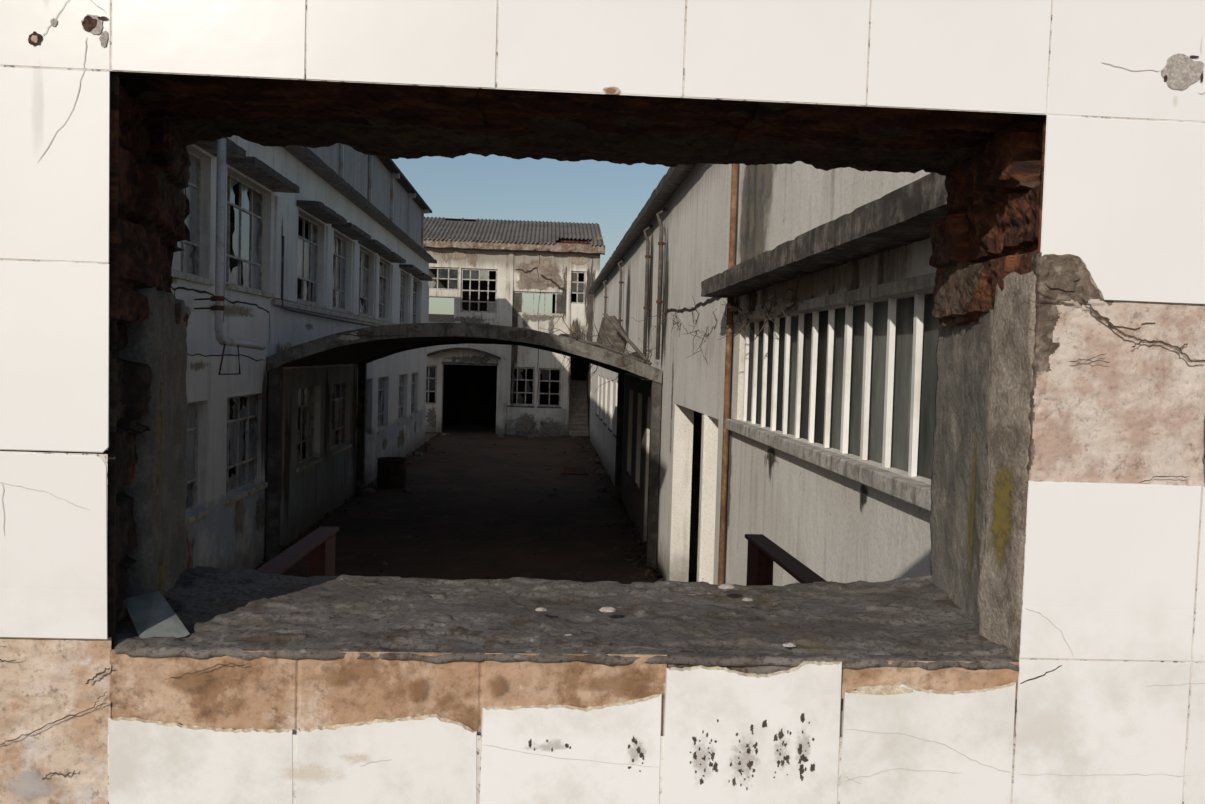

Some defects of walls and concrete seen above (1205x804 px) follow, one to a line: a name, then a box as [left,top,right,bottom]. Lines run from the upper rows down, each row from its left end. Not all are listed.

spalling [28,18,57,46]
crack [42,0,105,36]
spalling [81,14,108,47]
crack [38,38,87,161]
spalling [1161,53,1205,90]
peeling [1027,253,1205,486]
crack [0,482,88,536]
crack [1020,608,1074,684]
peeling [0,637,667,804]
water stain [690,713,815,790]